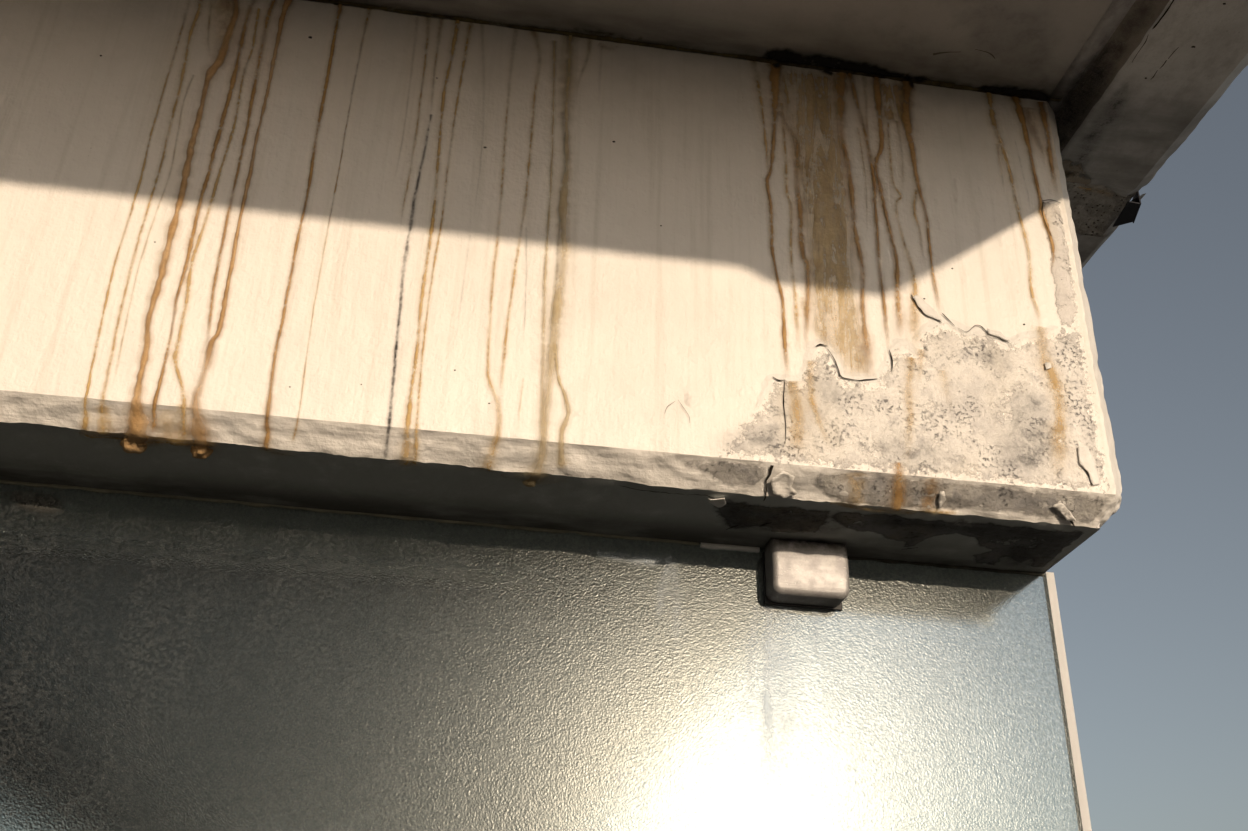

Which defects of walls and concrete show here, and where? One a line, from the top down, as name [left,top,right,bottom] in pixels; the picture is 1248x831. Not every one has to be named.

rust [82,0,292,450]
rust [403,200,443,465]
rust [436,20,471,182]
damp [308,0,1105,482]
rust [756,63,937,367]
crack [816,344,893,381]
peeling [687,202,1110,567]
crack [911,295,1009,343]
rust [986,92,1029,249]
rust [1011,96,1055,257]
rust [1047,368,1059,389]
spalling [1062,160,1091,185]